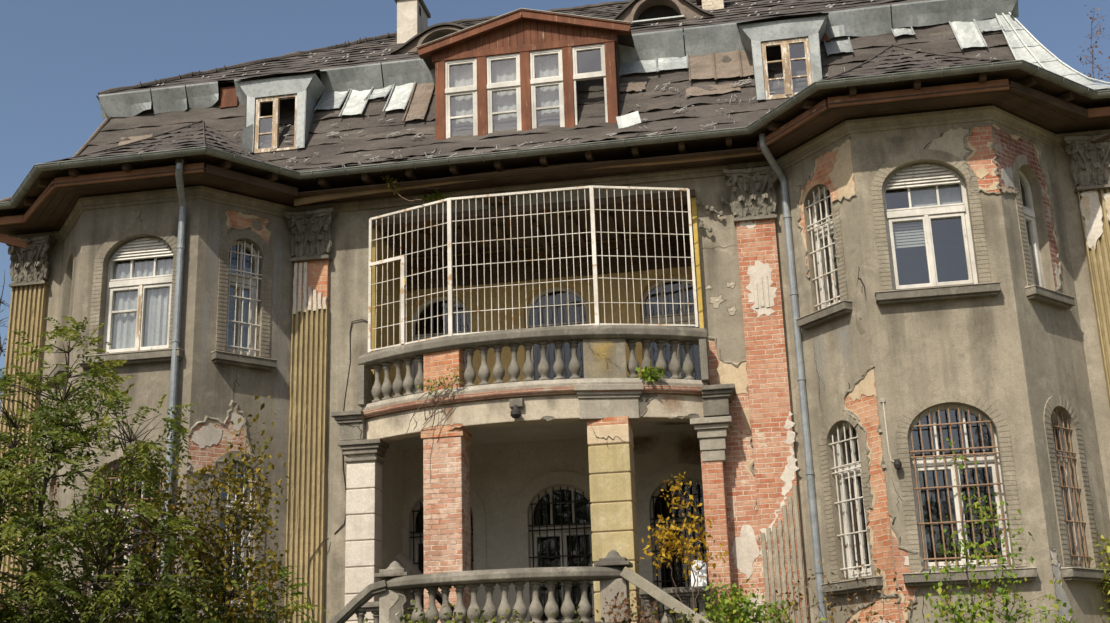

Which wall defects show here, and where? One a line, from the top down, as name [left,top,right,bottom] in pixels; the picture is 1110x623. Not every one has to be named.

flaking render [223,207,272,255]
flaking render [796,137,858,279]
flaking render [926,121,1062,292]
flaking render [1080,191,1110,250]
flaking render [186,400,256,476]
flaking render [842,366,925,623]